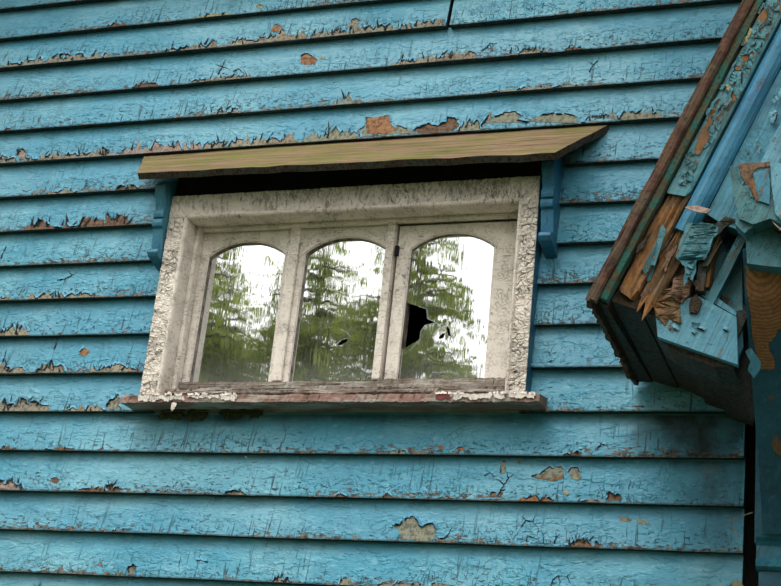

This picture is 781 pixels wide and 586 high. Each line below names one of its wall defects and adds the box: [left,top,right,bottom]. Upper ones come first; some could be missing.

peeling [163,15,442,52]
peeling [391,48,478,65]
peeling [678,0,781,185]
peeling [0,107,662,163]
peeling [23,210,135,230]
peeling [745,266,781,378]
peeling [0,359,67,373]
peeling [89,361,137,372]
peeling [0,395,50,411]
peeling [530,449,582,481]
crack [483,471,511,495]
peeling [392,513,438,541]